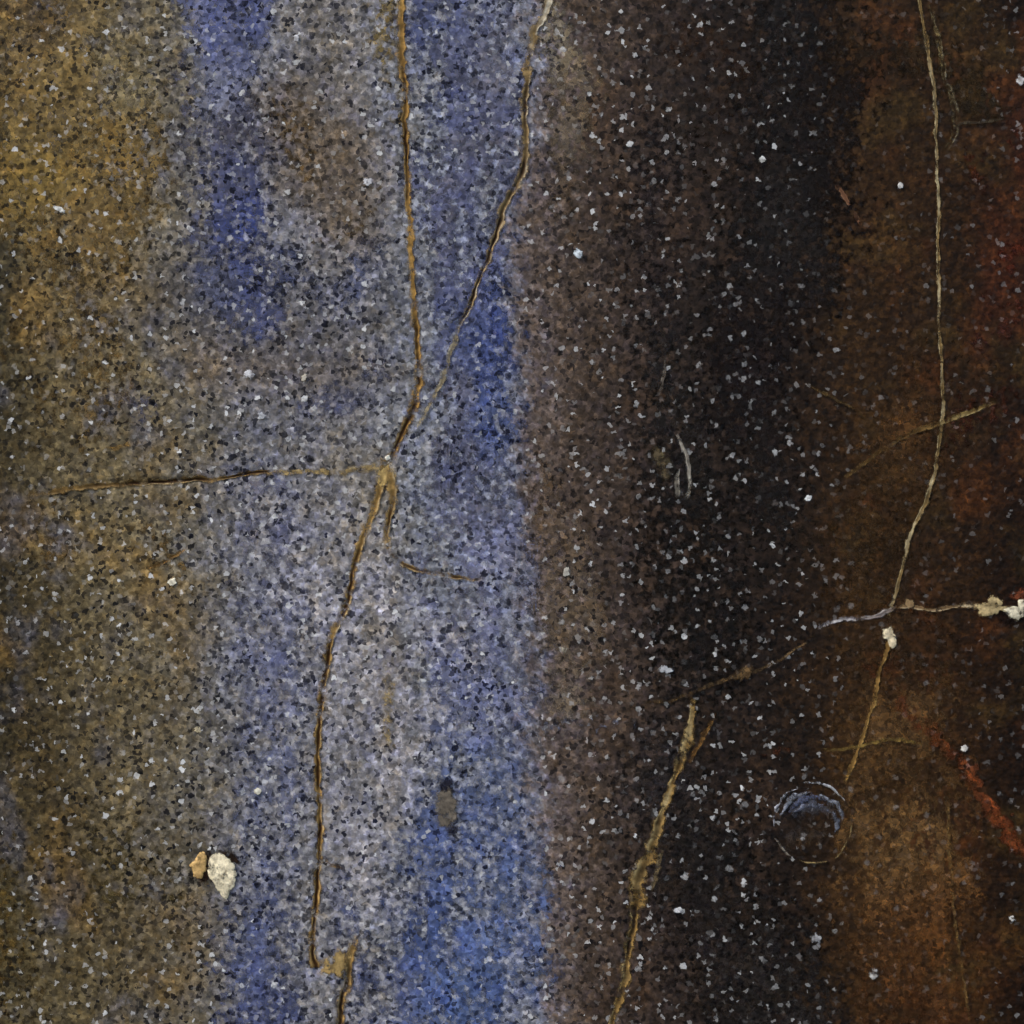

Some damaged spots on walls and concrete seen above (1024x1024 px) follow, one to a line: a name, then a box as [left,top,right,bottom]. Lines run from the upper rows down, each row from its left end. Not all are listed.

corrosion [656,19,760,133]
corrosion [824,7,1002,125]
crack [846,0,1003,608]
crack [33,0,553,1024]
crack [608,642,806,1024]
crack [833,640,915,781]
corrosion [818,338,1024,1024]
crack [952,896,968,1007]